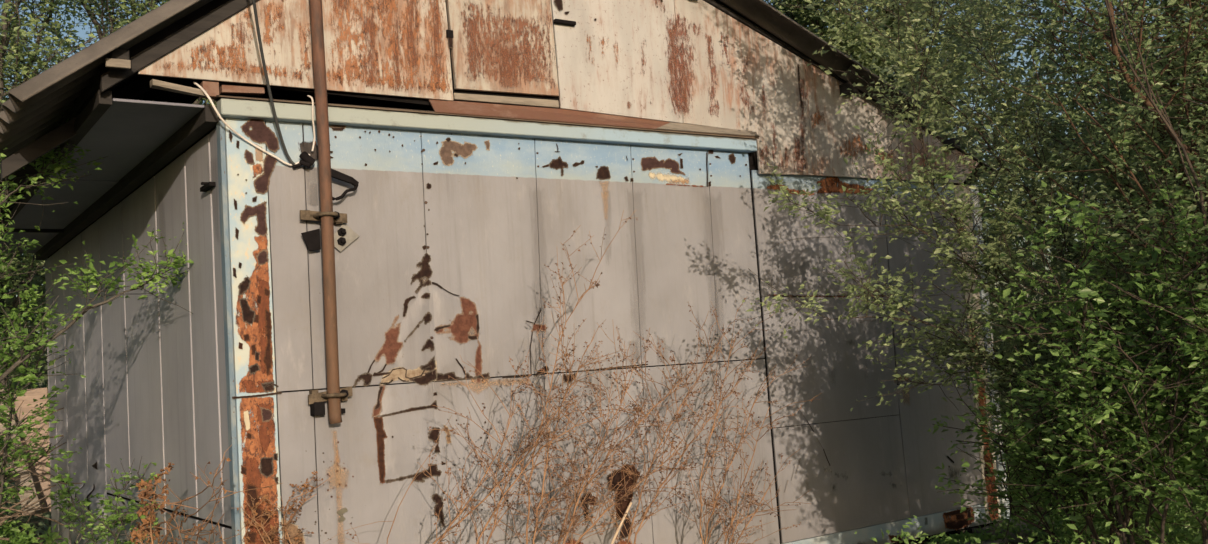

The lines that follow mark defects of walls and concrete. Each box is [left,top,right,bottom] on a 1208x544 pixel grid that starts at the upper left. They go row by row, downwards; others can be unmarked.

rust [138,0,729,124]
rust [740,59,824,172]
rust [253,145,263,178]
peeling [542,144,685,182]
rust [649,172,703,187]
peeling [699,150,747,187]
rust [767,176,872,195]
rust [840,134,893,165]
peeling [353,225,549,483]
rust [236,235,354,544]
peeling [563,364,648,383]